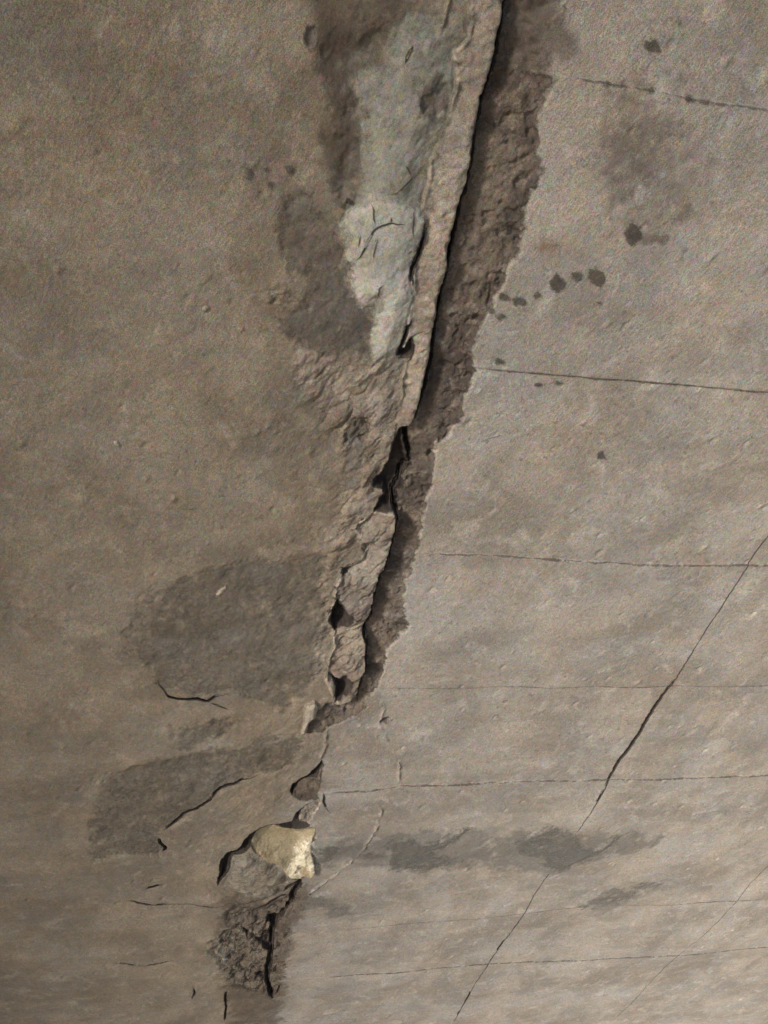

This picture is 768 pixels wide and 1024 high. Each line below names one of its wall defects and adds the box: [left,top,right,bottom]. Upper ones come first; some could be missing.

spalling [276,0,565,734]
crack [353,0,505,695]
damp [488,269,605,320]
crack [158,683,228,710]
crack [576,536,768,833]
crack [159,775,257,852]
damp [386,829,469,872]
damp [515,826,620,872]
spalling [203,883,306,998]
crack [454,875,548,1021]